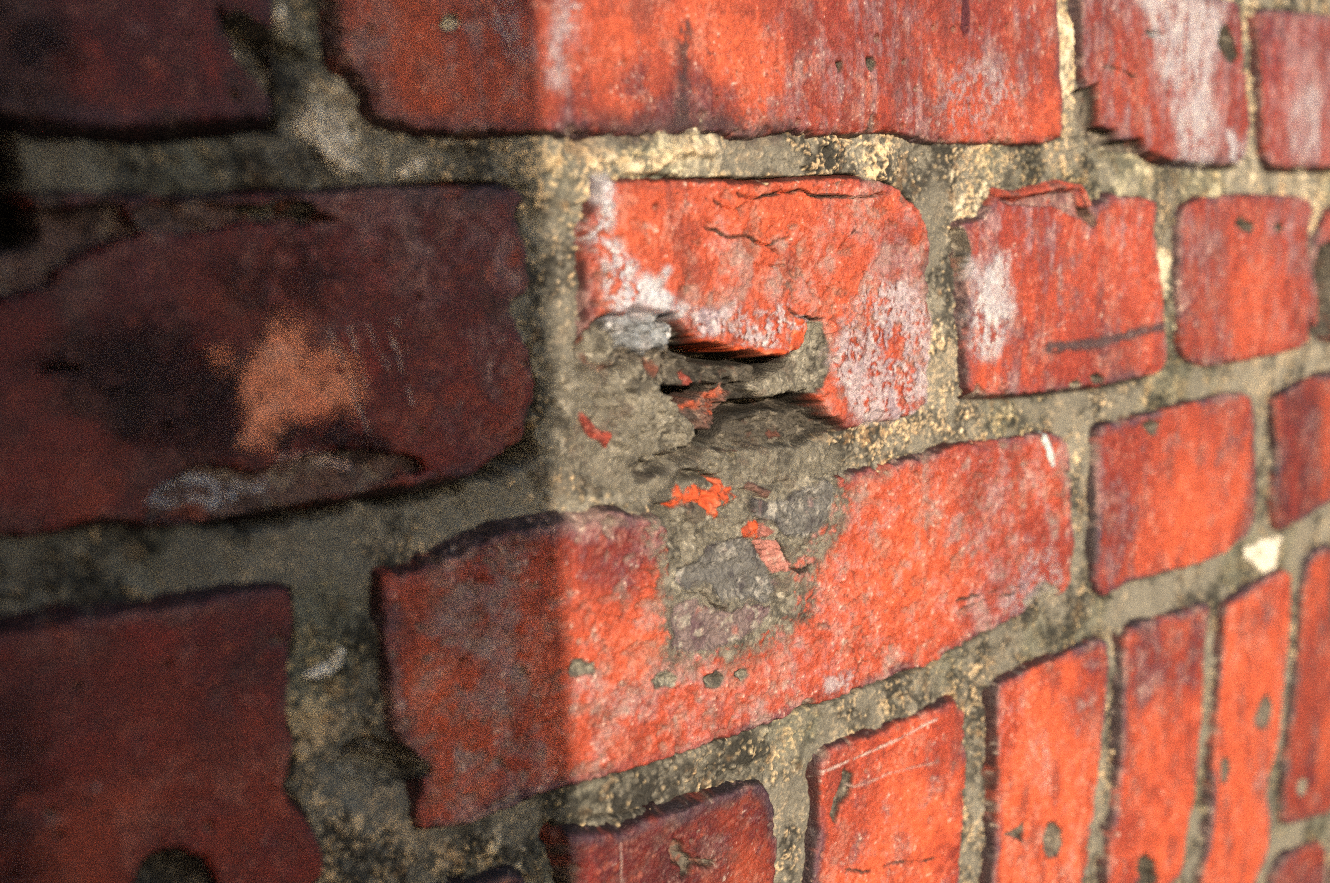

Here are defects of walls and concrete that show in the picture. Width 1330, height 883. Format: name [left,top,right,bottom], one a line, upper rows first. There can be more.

leakage [589,179,806,347]
crack [705,189,874,246]
efflorescence [828,281,930,423]
spalling [143,449,422,522]
spalling [544,310,850,689]